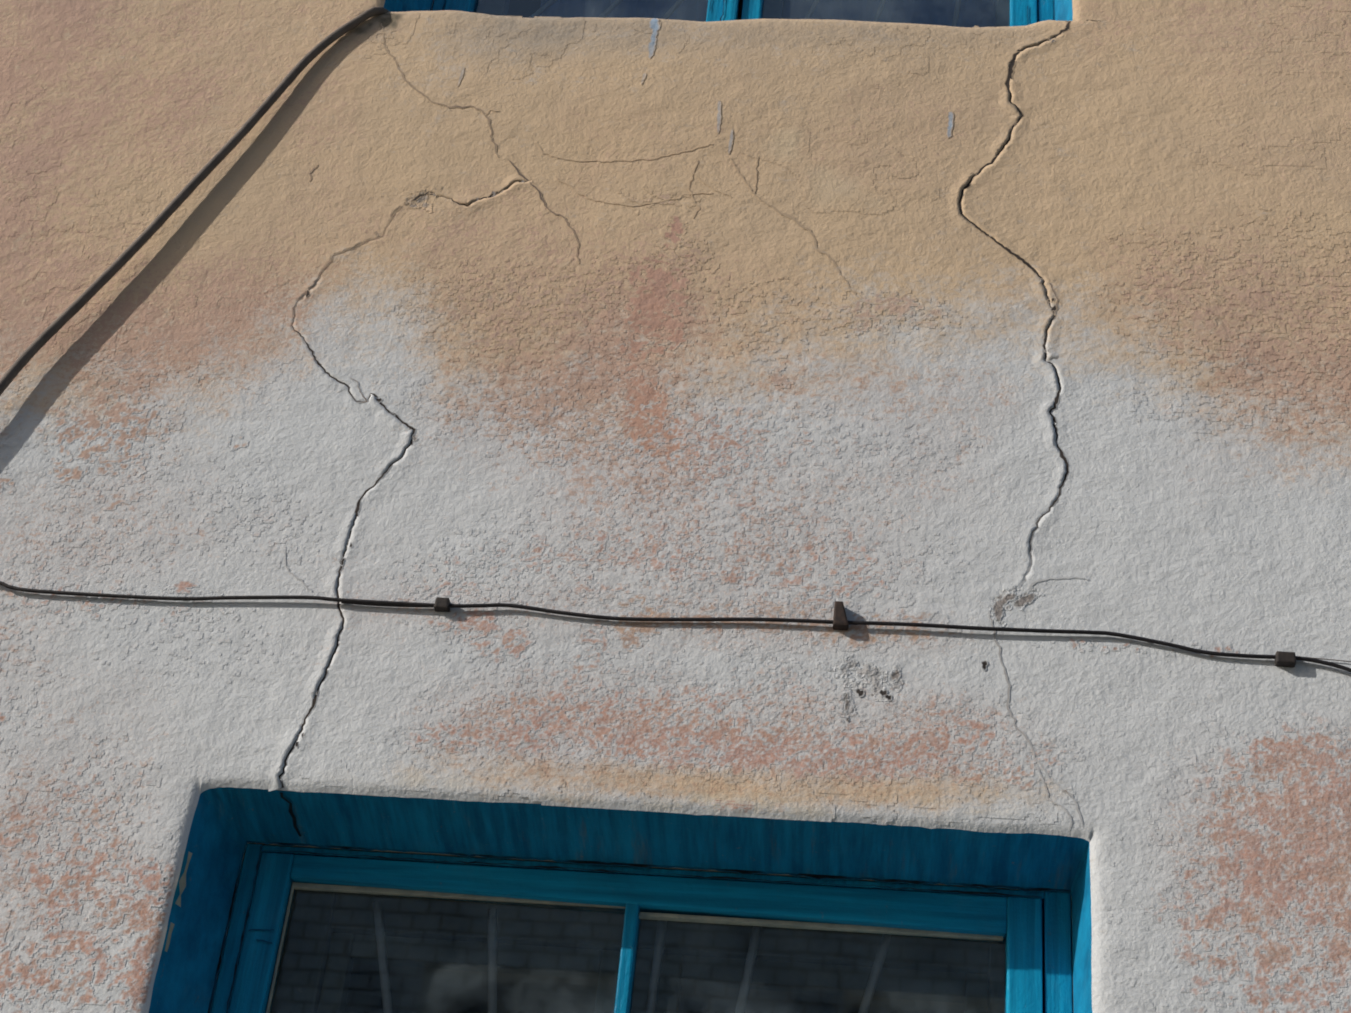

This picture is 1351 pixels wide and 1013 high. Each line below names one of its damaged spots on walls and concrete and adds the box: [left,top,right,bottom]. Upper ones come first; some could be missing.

crack [207,0,1084,1013]
peeling [370,204,1088,814]
peeling [1164,638,1239,659]
peeling [1107,707,1351,1013]